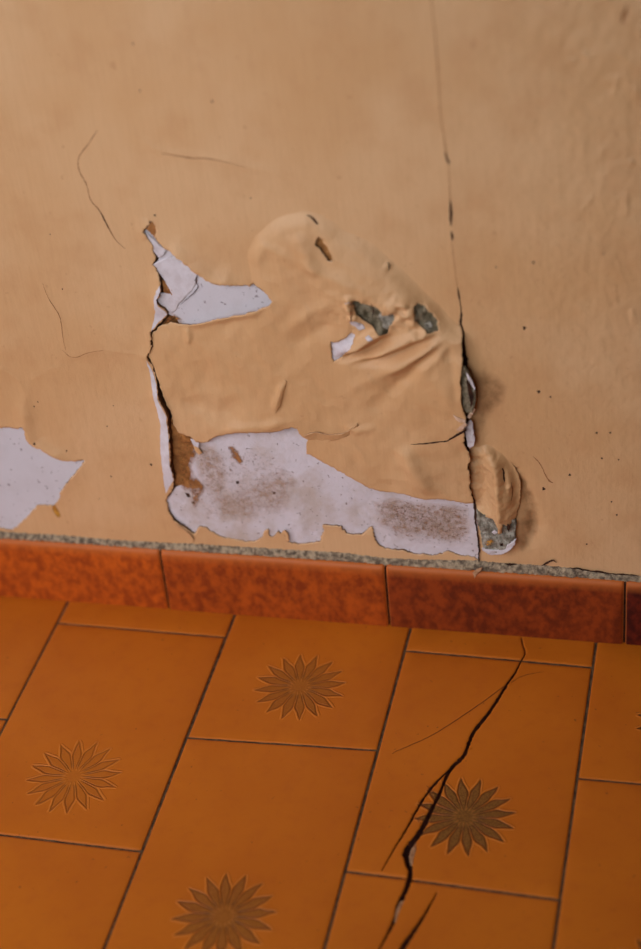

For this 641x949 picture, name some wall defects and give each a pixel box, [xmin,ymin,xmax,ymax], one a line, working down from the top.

crack [78,130,124,248]
peeling [145,214,272,325]
crack [431,0,481,562]
peeling [0,427,84,529]
peeling [167,418,517,579]
crack [541,560,637,576]
crack [379,641,539,949]